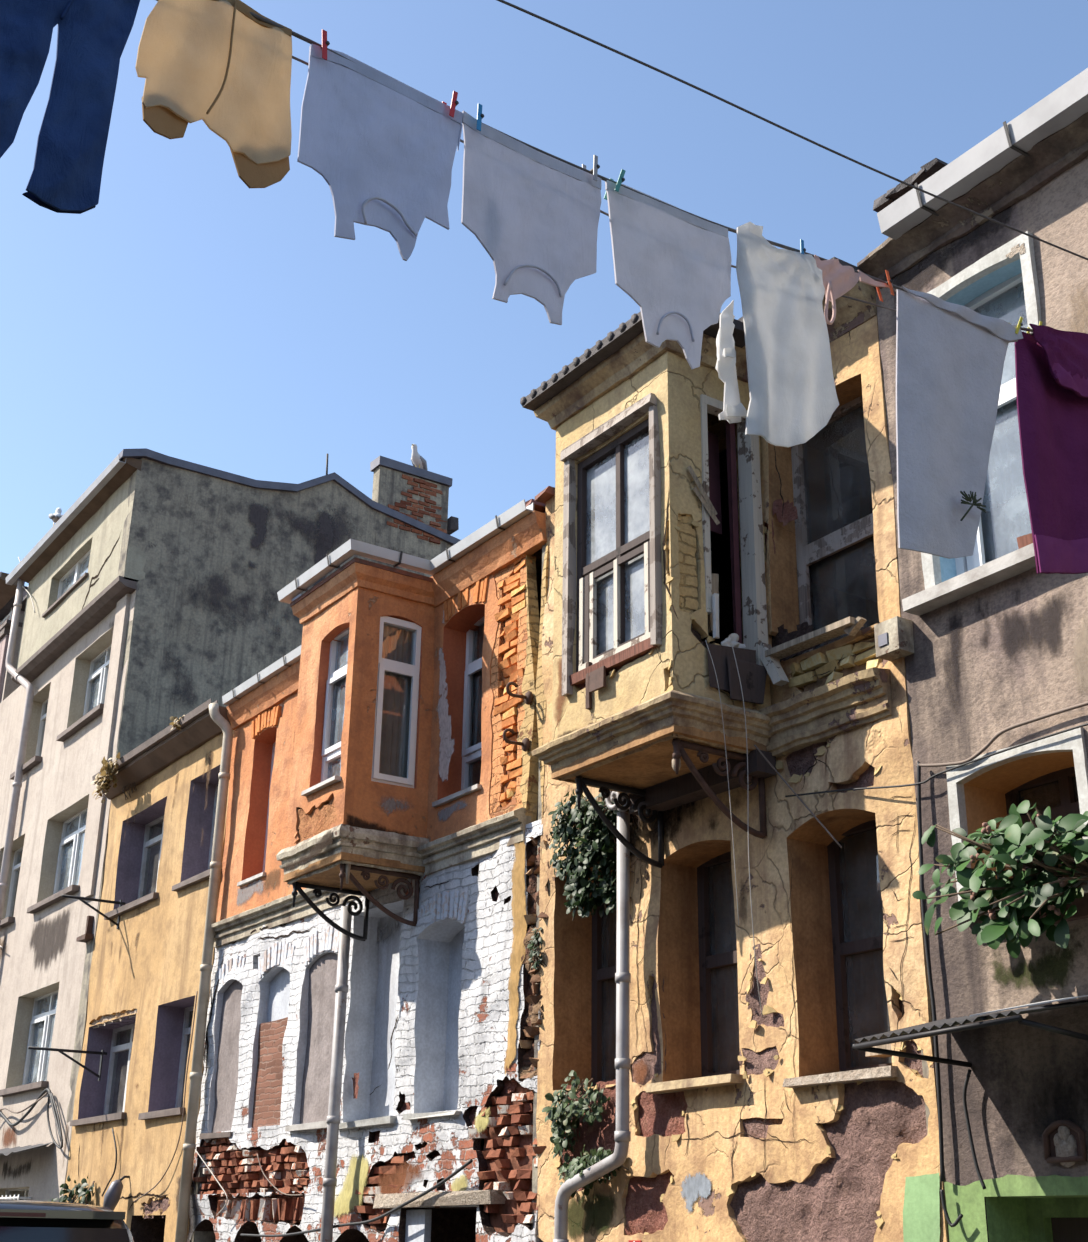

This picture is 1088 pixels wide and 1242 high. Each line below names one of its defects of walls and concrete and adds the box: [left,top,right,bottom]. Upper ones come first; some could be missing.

damp [249,503,269,568]
damp [287,511,350,587]
crack [663,483,678,618]
spalling [772,622,883,692]
damp [944,616,962,705]
damp [1001,597,1065,657]
crack [889,796,916,1025]
spalling [631,978,688,1142]
spalling [193,1138,310,1224]
spalling [469,1079,616,1233]
spalling [625,1171,674,1238]
spalling [726,1040,927,1242]